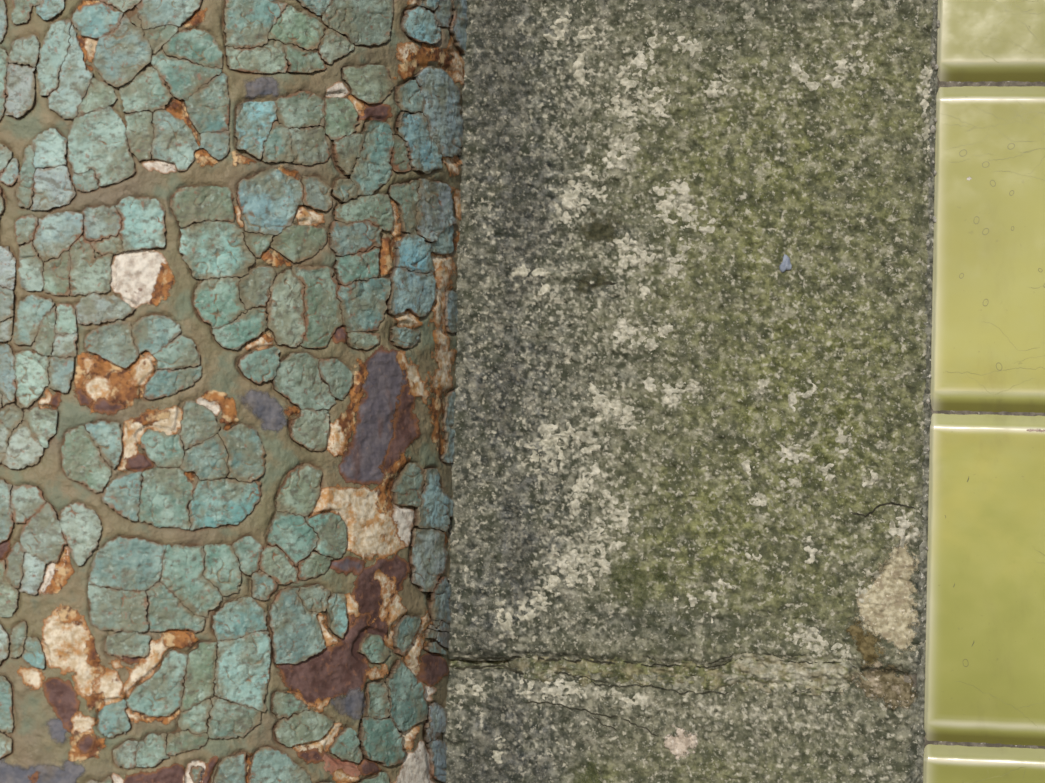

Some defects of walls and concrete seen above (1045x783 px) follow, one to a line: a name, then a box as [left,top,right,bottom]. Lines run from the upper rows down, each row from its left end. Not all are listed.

rust [38,389,62,410]
rust [74,351,183,472]
rust [196,390,239,430]
peeling [0,0,468,783]
rust [17,604,125,763]
crack [527,701,659,736]
crack [454,654,858,695]
spalling [850,526,920,710]